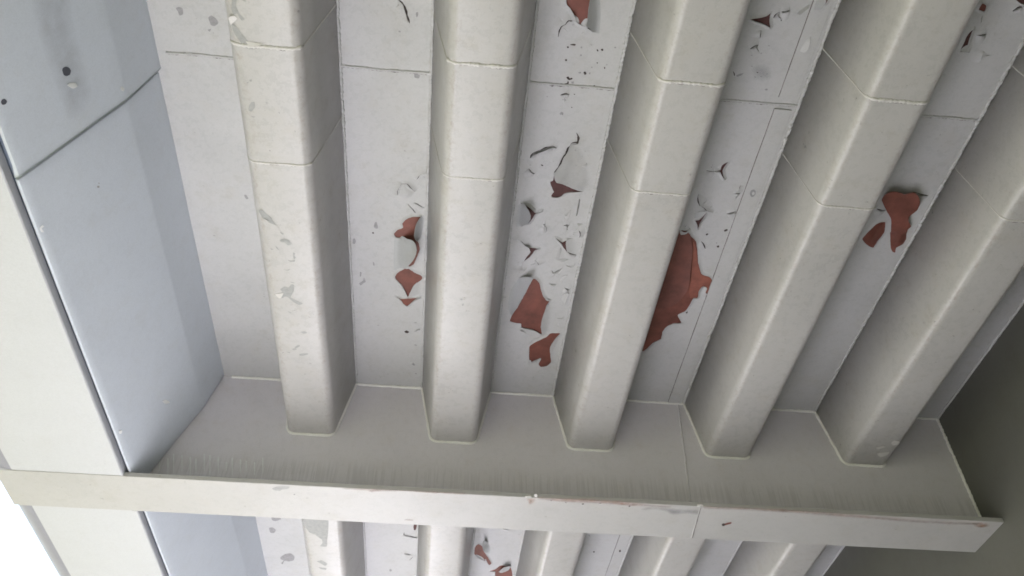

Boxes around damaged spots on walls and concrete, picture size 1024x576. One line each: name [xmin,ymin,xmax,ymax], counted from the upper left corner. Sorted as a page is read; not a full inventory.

peeling [550,0,601,37]
peeling [956,0,992,63]
peeling [859,186,931,253]
peeling [390,213,425,308]
peeling [506,132,593,379]
peeling [642,211,713,353]
peeling [472,541,514,576]